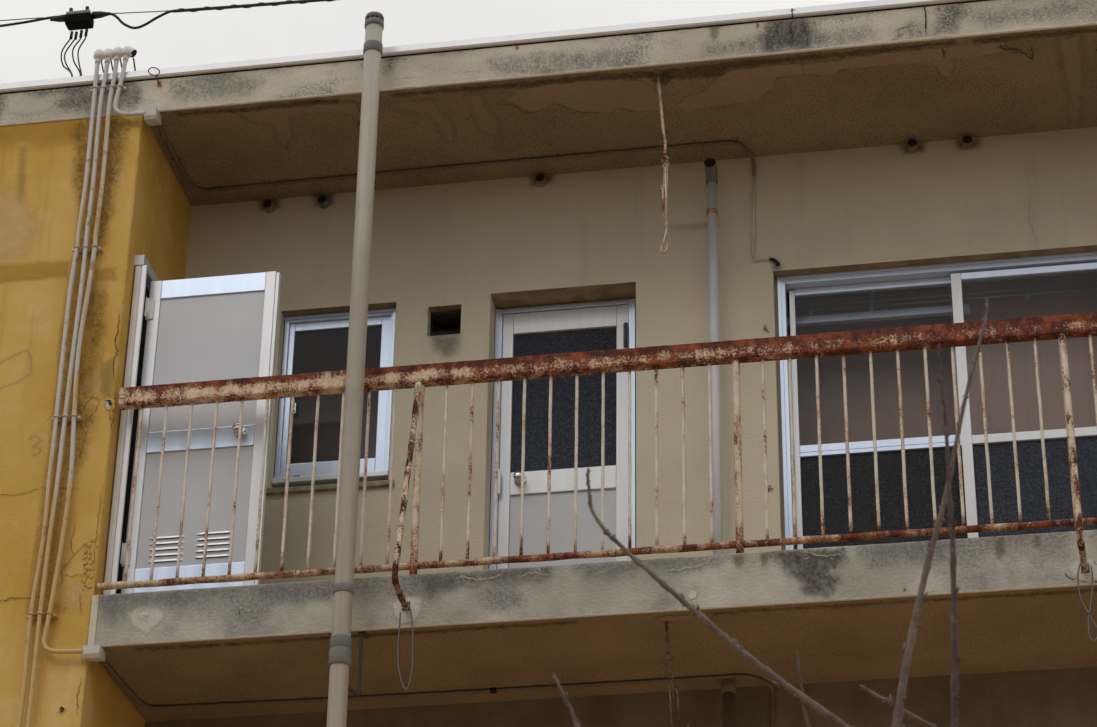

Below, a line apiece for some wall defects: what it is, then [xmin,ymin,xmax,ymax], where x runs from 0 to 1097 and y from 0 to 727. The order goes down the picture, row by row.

water stain [393,5,960,97]
water stain [975,30,1097,43]
peeling [507,42,1007,114]
water stain [180,100,338,116]
water stain [771,547,845,595]